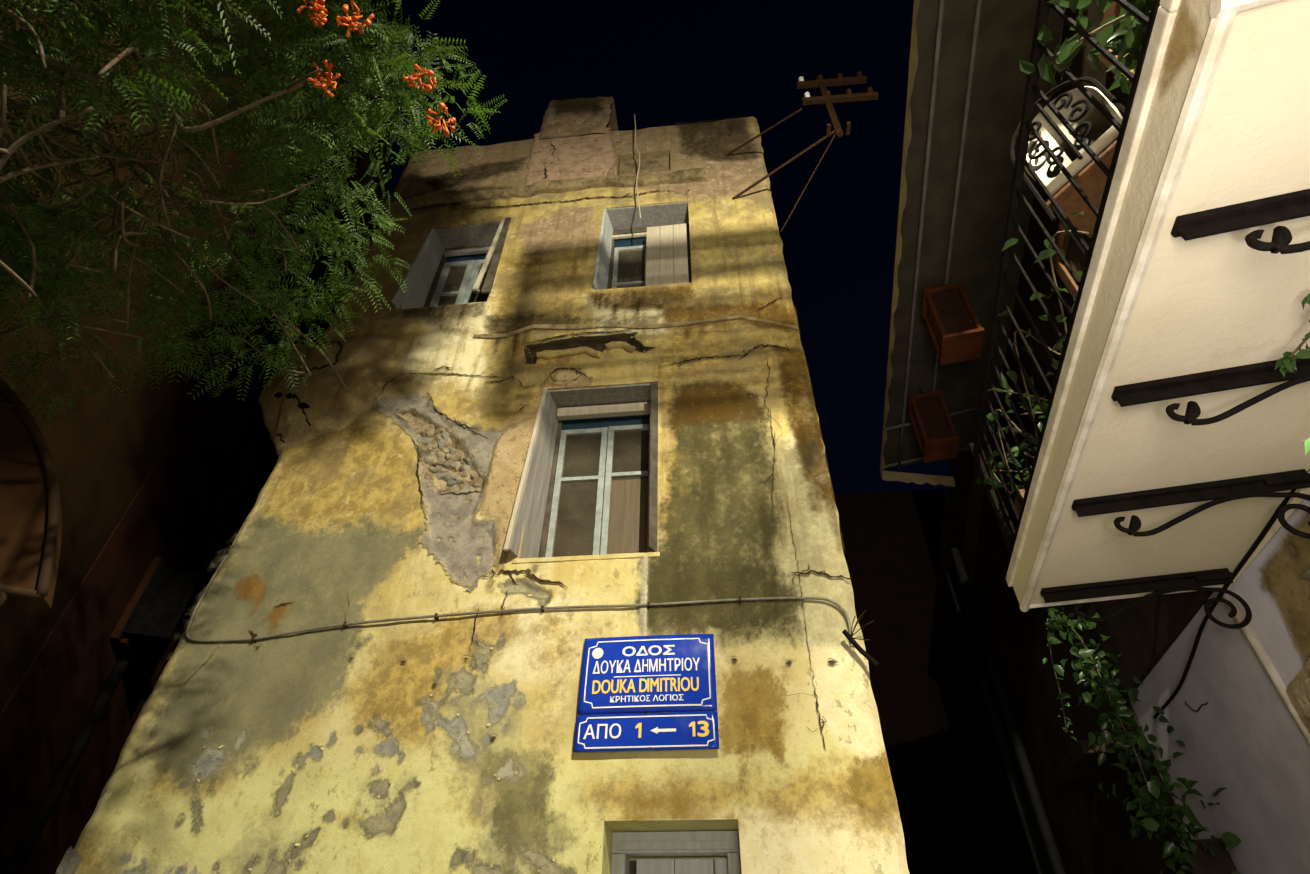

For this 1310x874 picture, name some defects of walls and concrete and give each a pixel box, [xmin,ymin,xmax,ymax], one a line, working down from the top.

spalling [524,329,656,387]
damp [636,383,803,640]
crack [658,295,852,749]
peeling [136,390,553,833]
crack [469,569,568,650]
peeling [242,713,421,874]
peeling [56,847,81,874]
peeling [117,848,220,874]
peeling [450,836,577,874]